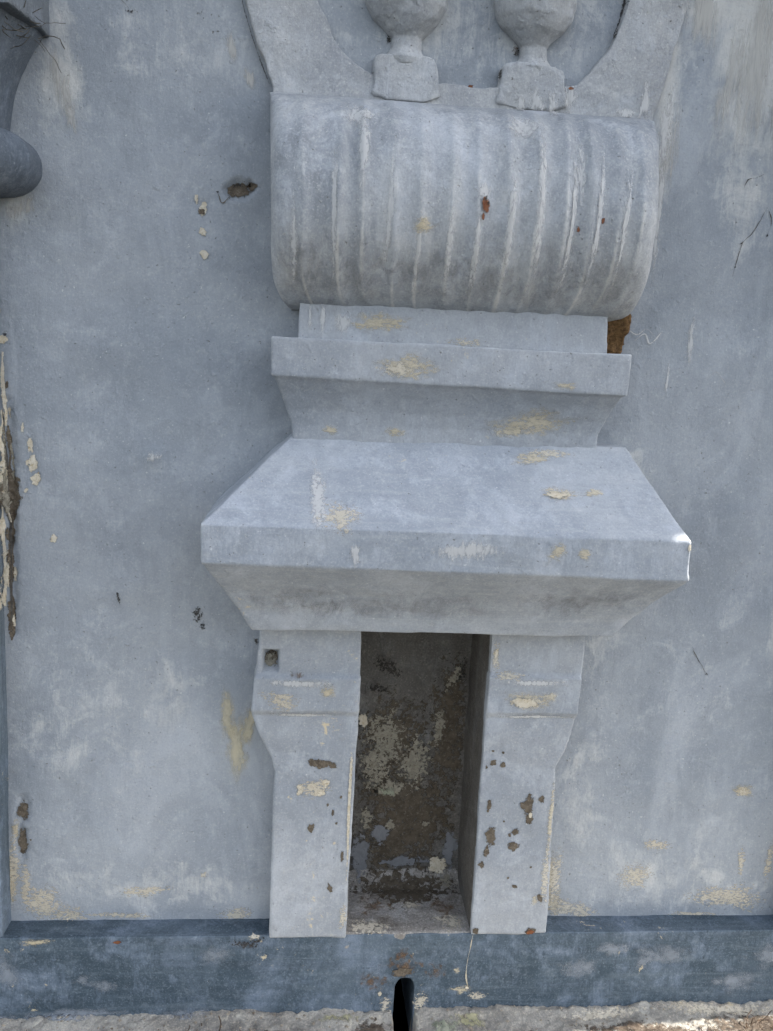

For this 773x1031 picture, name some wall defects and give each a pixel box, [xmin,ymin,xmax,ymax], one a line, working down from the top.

peeling [195,194,207,237]
flaking render [216,182,257,203]
flaking render [0,333,41,640]
peeling [492,642,567,718]
peeling [296,652,470,887]
peeling [477,790,595,917]
peeling [338,903,389,936]